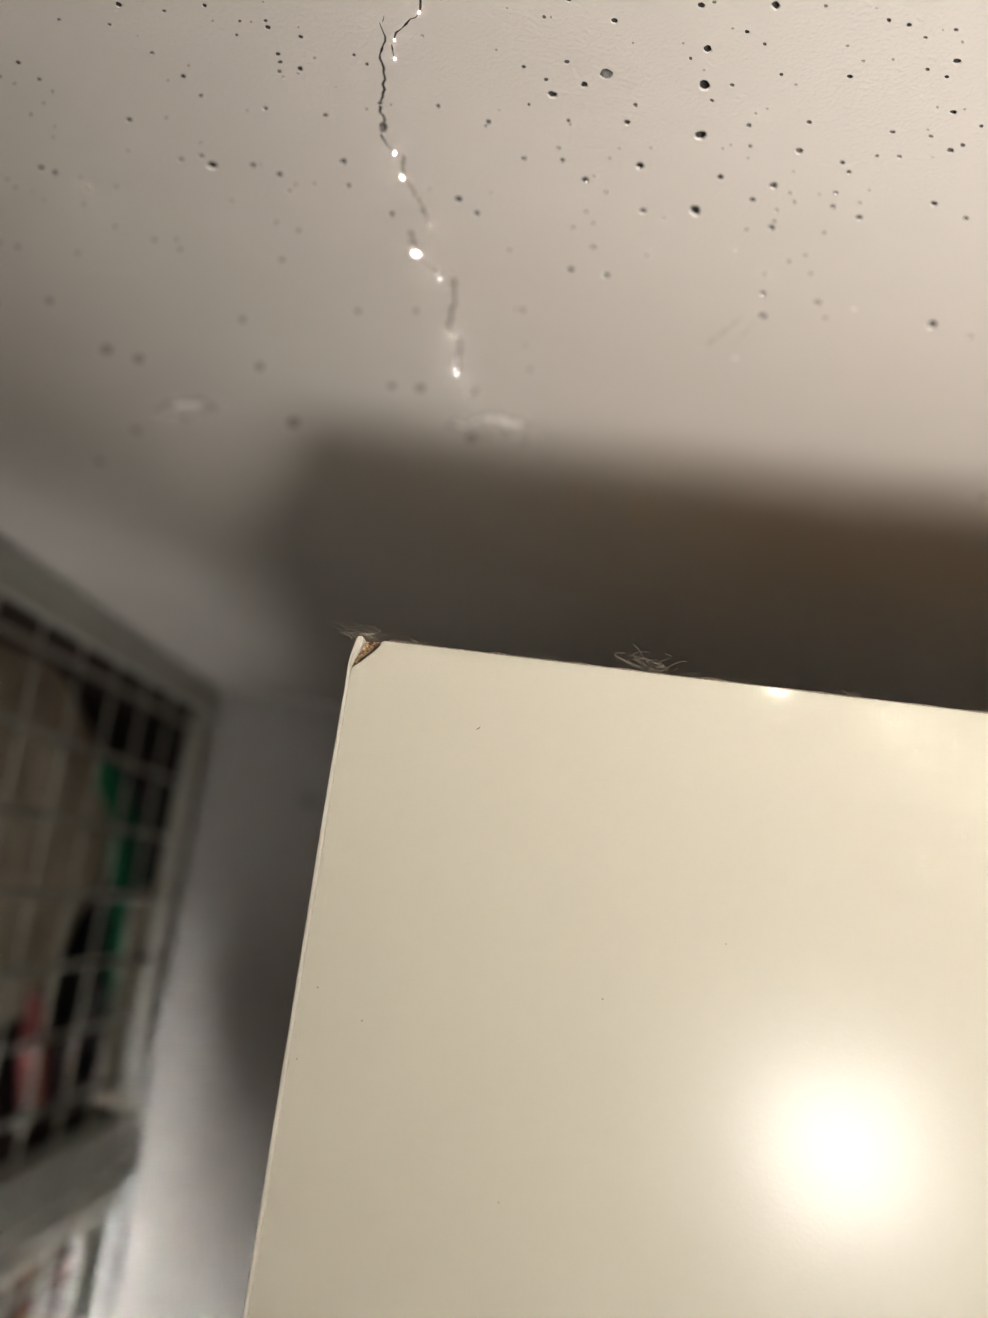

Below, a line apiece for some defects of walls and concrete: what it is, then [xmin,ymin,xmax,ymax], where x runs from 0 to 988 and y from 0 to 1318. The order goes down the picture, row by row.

crack [377,0,478,397]